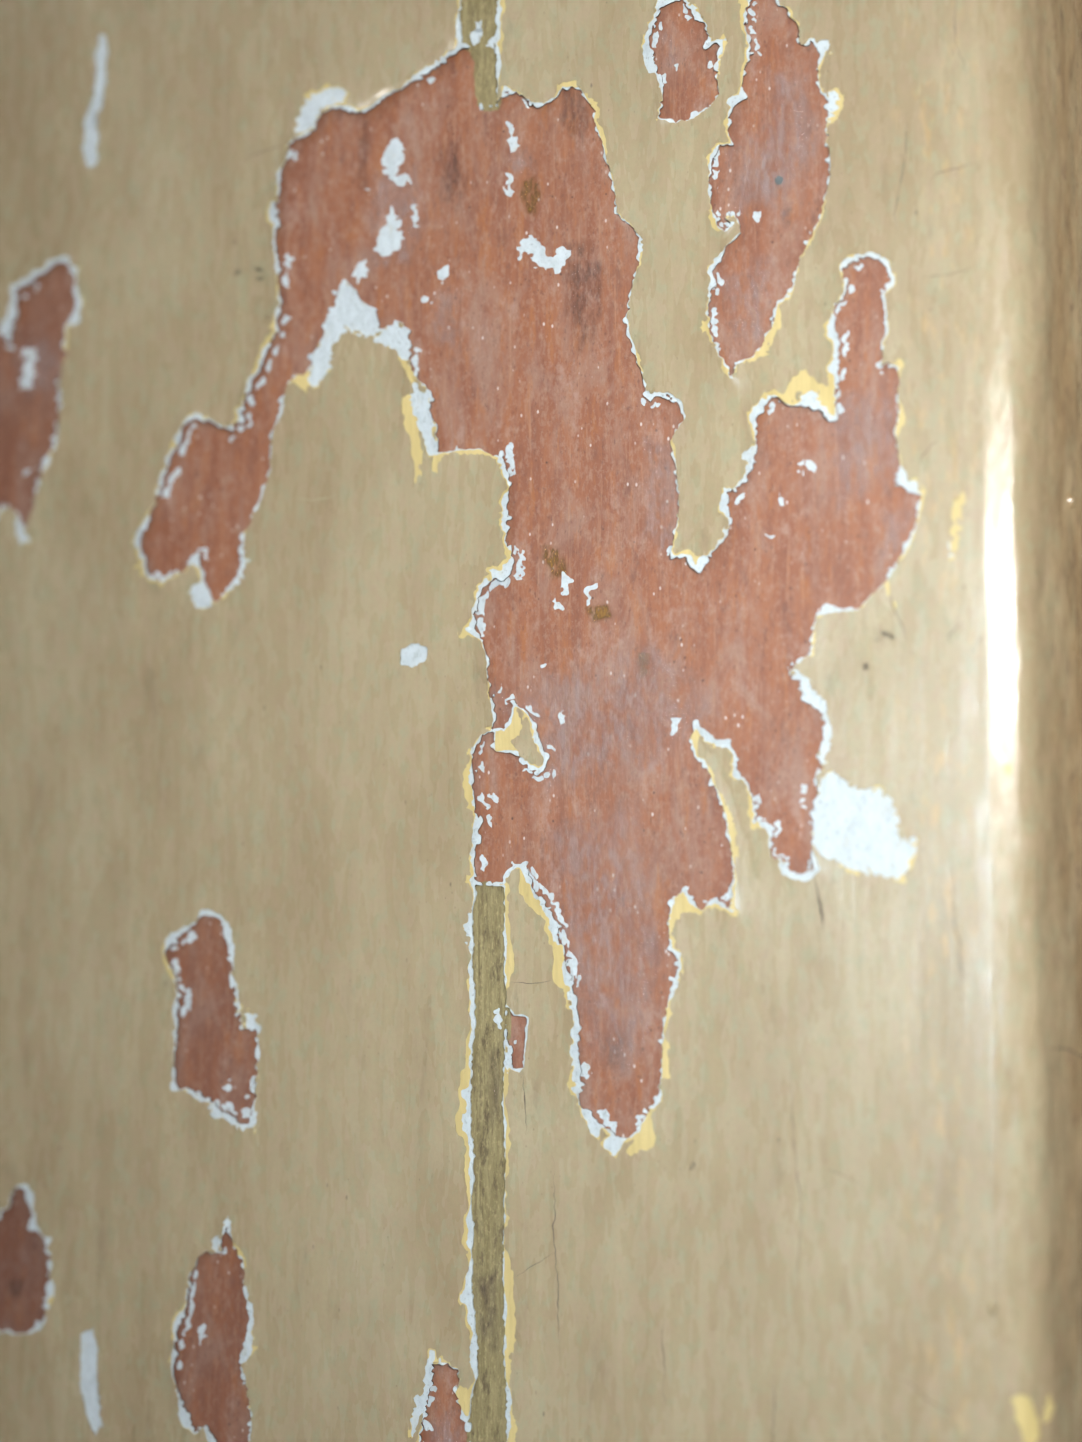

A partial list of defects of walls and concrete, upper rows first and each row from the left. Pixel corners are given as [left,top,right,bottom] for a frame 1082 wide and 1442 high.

peeling [0,255,85,545]
peeling [132,0,926,1158]
peeling [0,1183,55,1335]
peeling [167,1216,258,1442]
peeling [408,1348,472,1442]